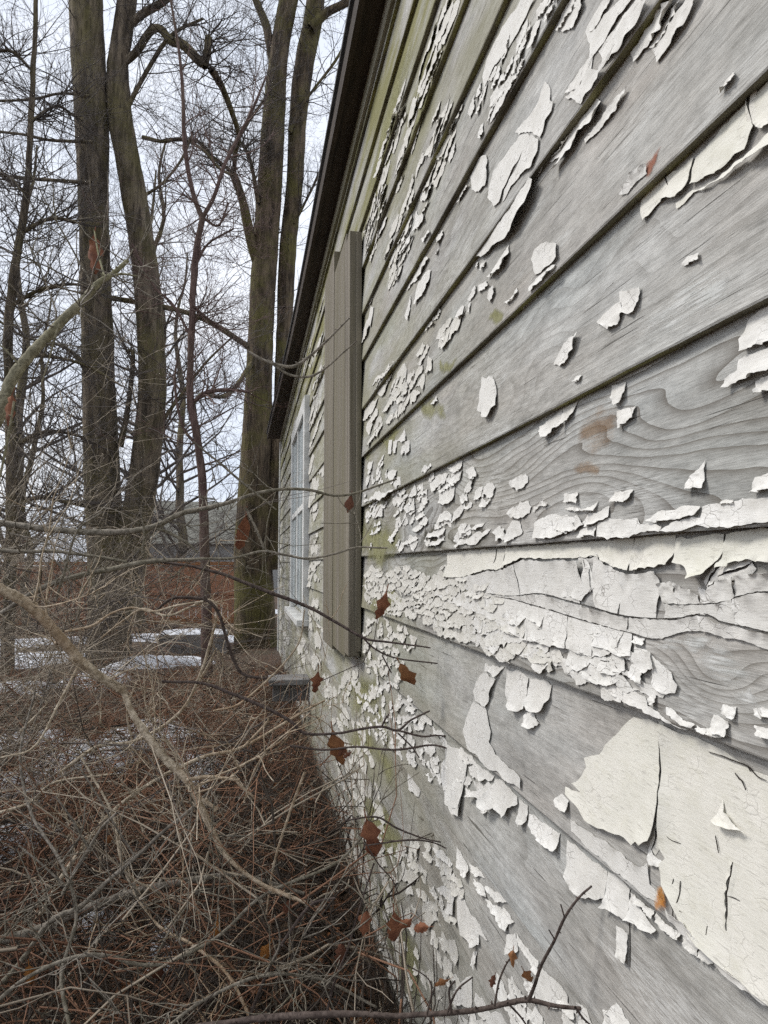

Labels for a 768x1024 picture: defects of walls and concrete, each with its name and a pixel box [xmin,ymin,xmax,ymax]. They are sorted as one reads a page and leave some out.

peeling [279,0,768,1024]
crack [476,548,767,639]
crack [650,720,681,855]
crack [710,752,767,791]
crack [706,836,740,933]